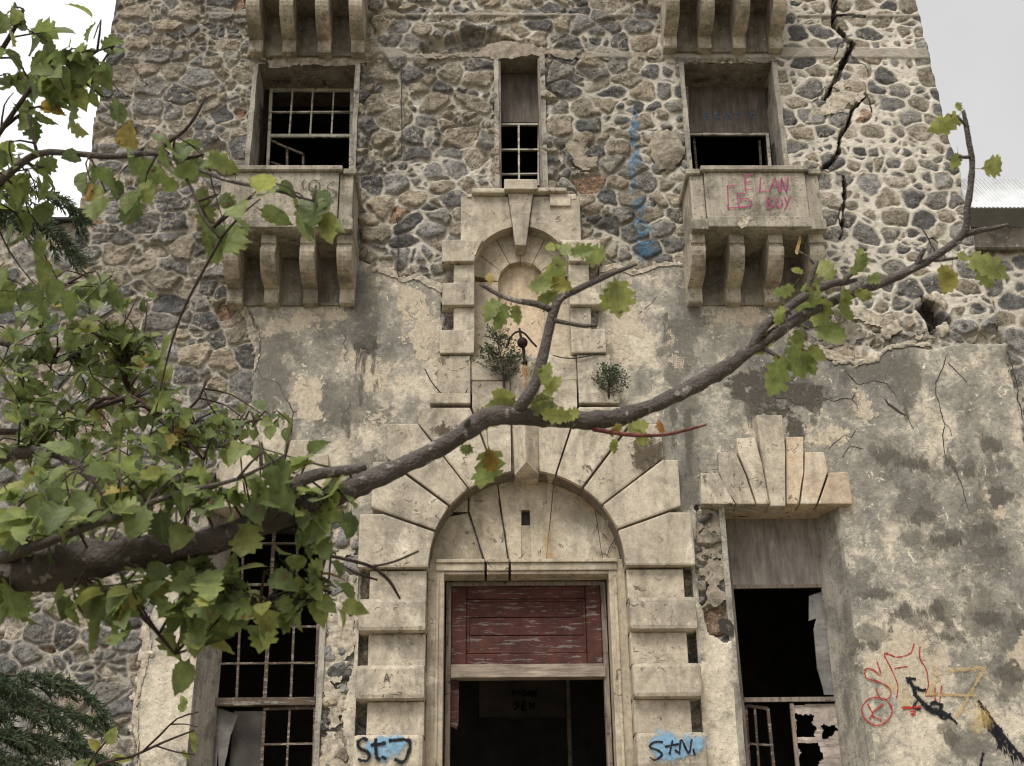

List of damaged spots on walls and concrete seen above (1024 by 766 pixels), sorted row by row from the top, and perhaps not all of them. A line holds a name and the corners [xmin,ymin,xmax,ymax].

crack [813,0,872,238]
leakage [341,416,350,438]
leakage [353,334,380,405]
leakage [723,366,836,445]
crack [749,369,914,505]
peeling [814,302,949,367]
peeling [924,291,948,309]
crack [935,355,968,506]
crack [452,498,510,573]
peeling [696,506,732,631]